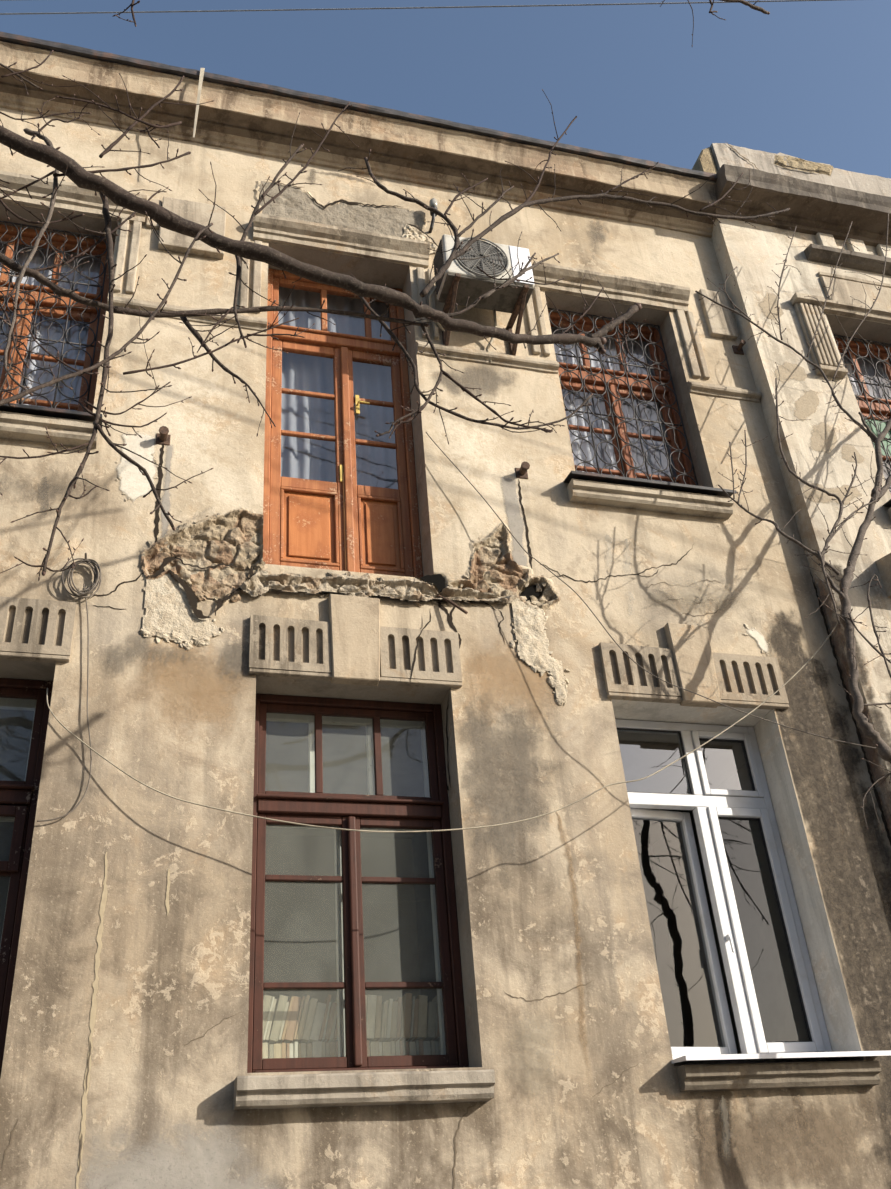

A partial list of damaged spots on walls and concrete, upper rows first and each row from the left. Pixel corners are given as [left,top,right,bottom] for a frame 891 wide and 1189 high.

flaking render [253,179,438,254]
flaking render [116,431,268,650]
flaking render [445,477,561,611]
crack [518,481,739,616]
leakage [825,565,844,628]
leakage [694,613,891,1183]
crack [76,852,108,1189]